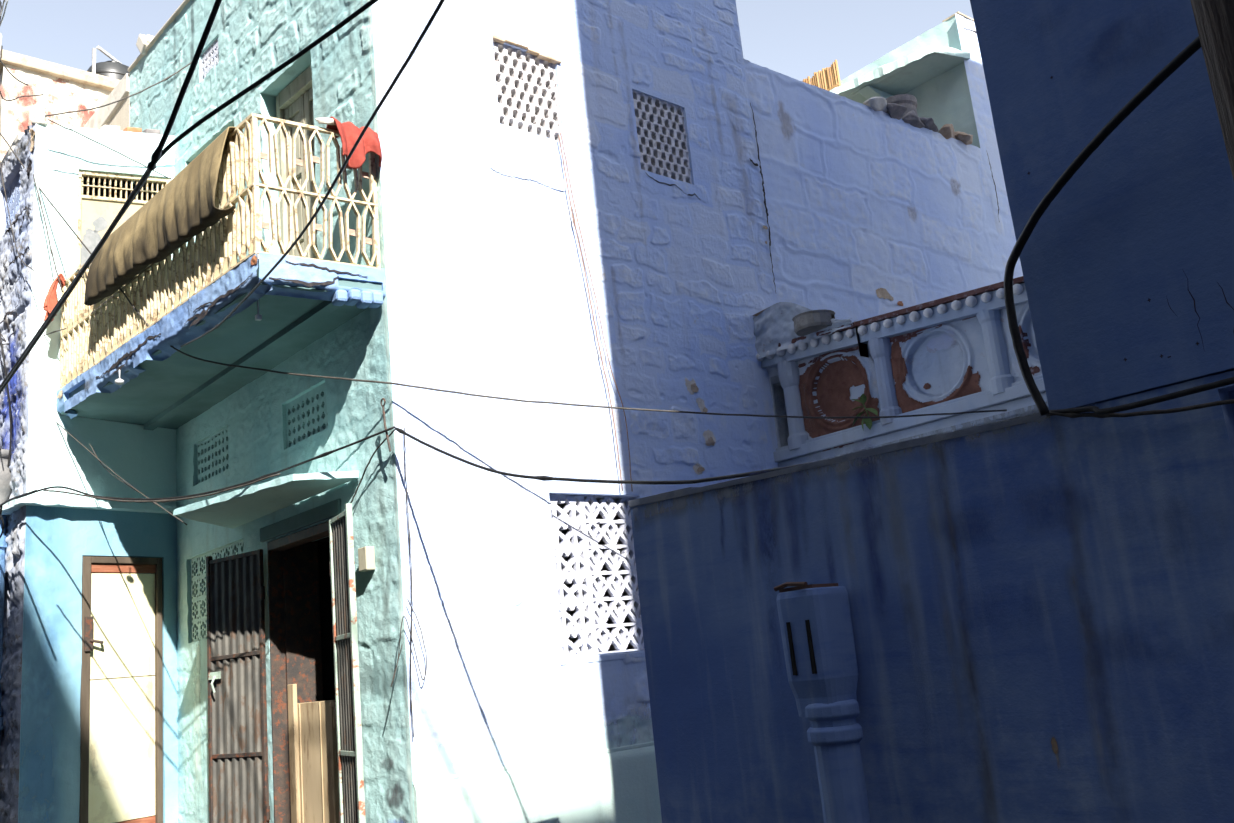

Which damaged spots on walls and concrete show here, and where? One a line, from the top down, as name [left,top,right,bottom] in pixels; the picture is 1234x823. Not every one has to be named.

crack [1166,274,1234,348]
peeling [798,346,880,451]
peeling [889,316,982,413]